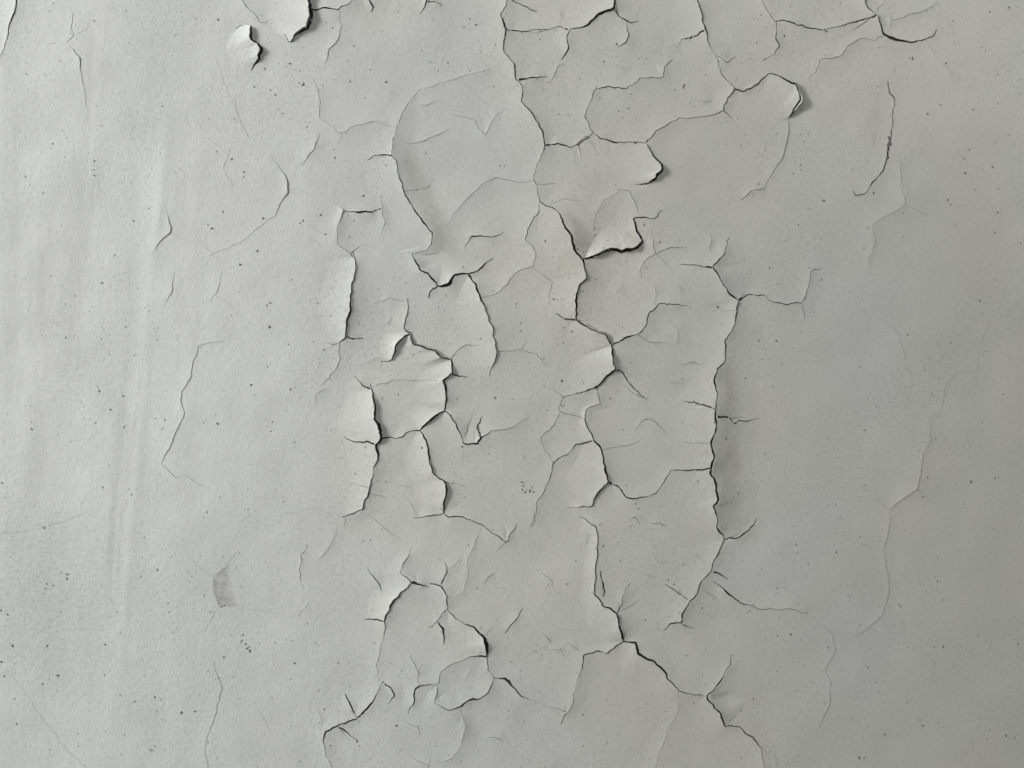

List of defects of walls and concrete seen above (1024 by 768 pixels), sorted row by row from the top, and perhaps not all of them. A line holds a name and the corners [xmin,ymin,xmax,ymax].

peeling [226,0,387,88]
crack [408,0,445,20]
crack [528,6,716,155]
crack [748,0,877,70]
crack [293,75,580,252]
crack [851,79,932,272]
peeling [312,0,963,768]
crack [607,229,717,442]
crack [204,508,336,630]
crack [349,472,543,604]
crack [306,633,404,768]
crack [535,626,581,661]